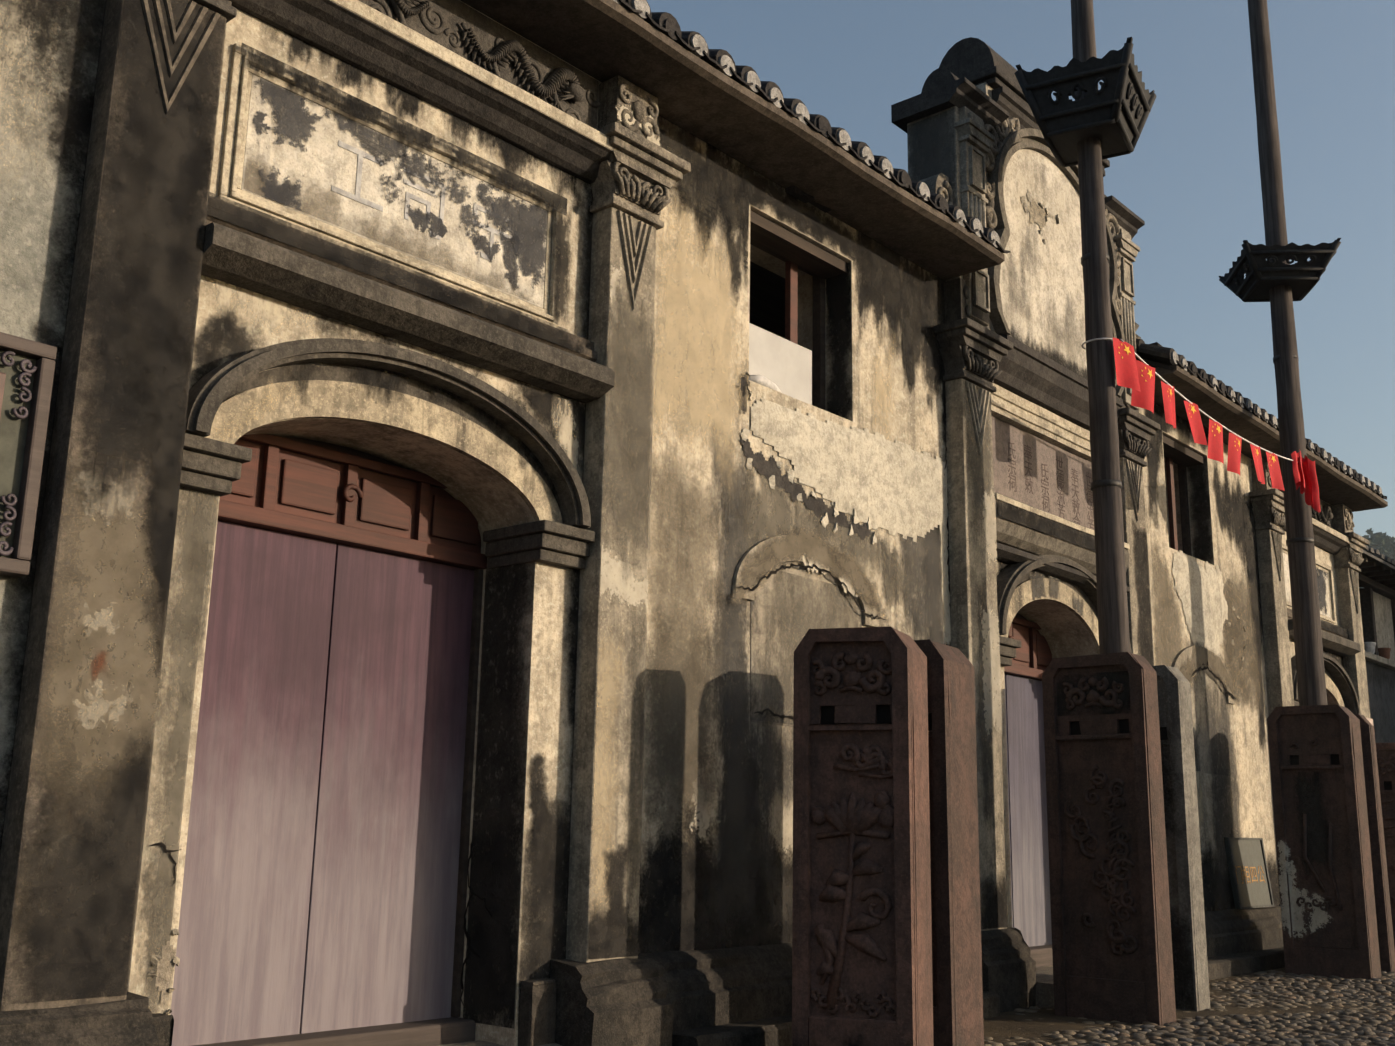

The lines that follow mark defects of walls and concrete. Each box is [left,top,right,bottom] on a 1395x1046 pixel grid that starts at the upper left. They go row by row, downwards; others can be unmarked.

water stain [1011,325,1088,380]
water stain [0,324,65,853]
water stain [2,0,593,1028]
water stain [588,105,955,960]
flaking render [736,372,877,545]
water stain [978,580,1002,818]
water stain [964,381,1095,572]
water stain [1030,572,1084,616]
water stain [1124,402,1266,911]
water stain [981,876,1008,929]
water stain [1170,913,1195,1010]